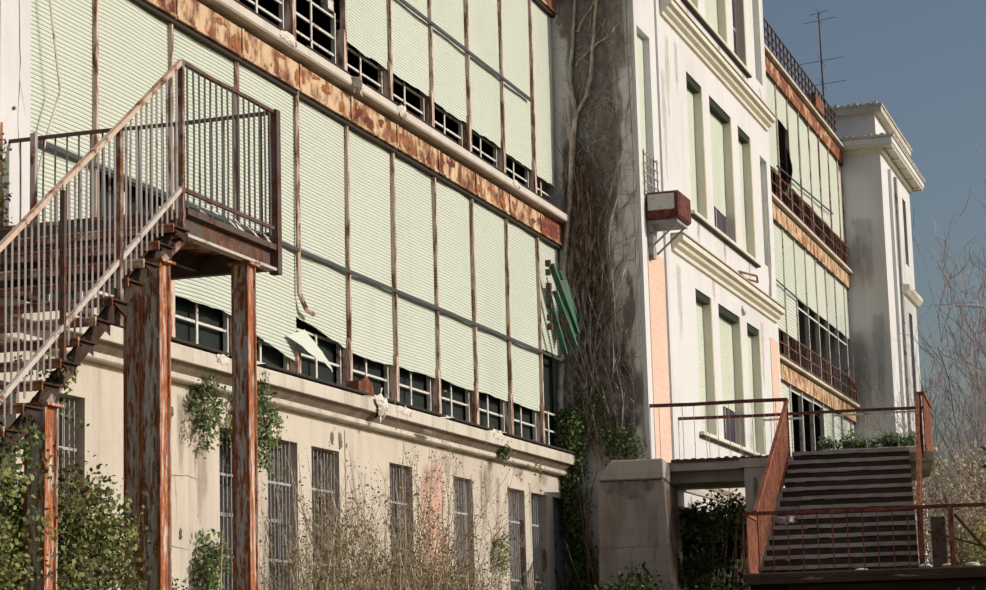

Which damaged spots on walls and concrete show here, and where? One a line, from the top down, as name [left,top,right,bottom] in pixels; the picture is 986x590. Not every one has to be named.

corrosion [294,69,331,95]
corrosion [340,101,384,131]
corrosion [392,133,455,172]